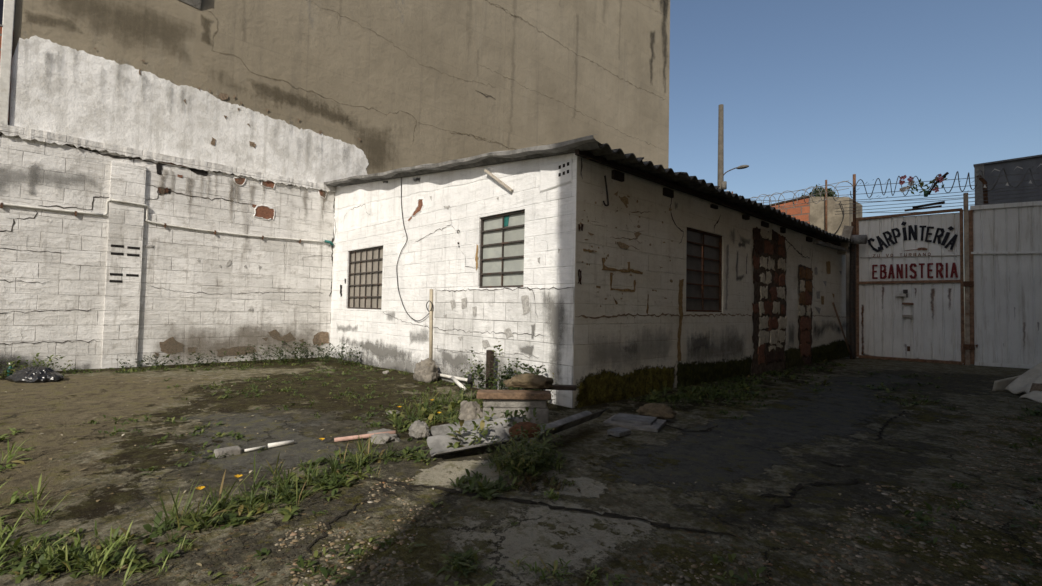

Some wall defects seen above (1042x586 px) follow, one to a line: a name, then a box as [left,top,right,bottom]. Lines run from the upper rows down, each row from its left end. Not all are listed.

damp [255,84,349,123]
damp [0,165,86,194]
crack [65,144,248,204]
spalling [156,162,188,178]
spalling [233,175,247,186]
crack [0,196,109,284]
peeling [580,191,673,307]
spalling [736,226,842,375]
crack [0,304,100,353]
peeling [269,329,329,346]
damp [338,326,416,373]
damp [435,351,518,390]